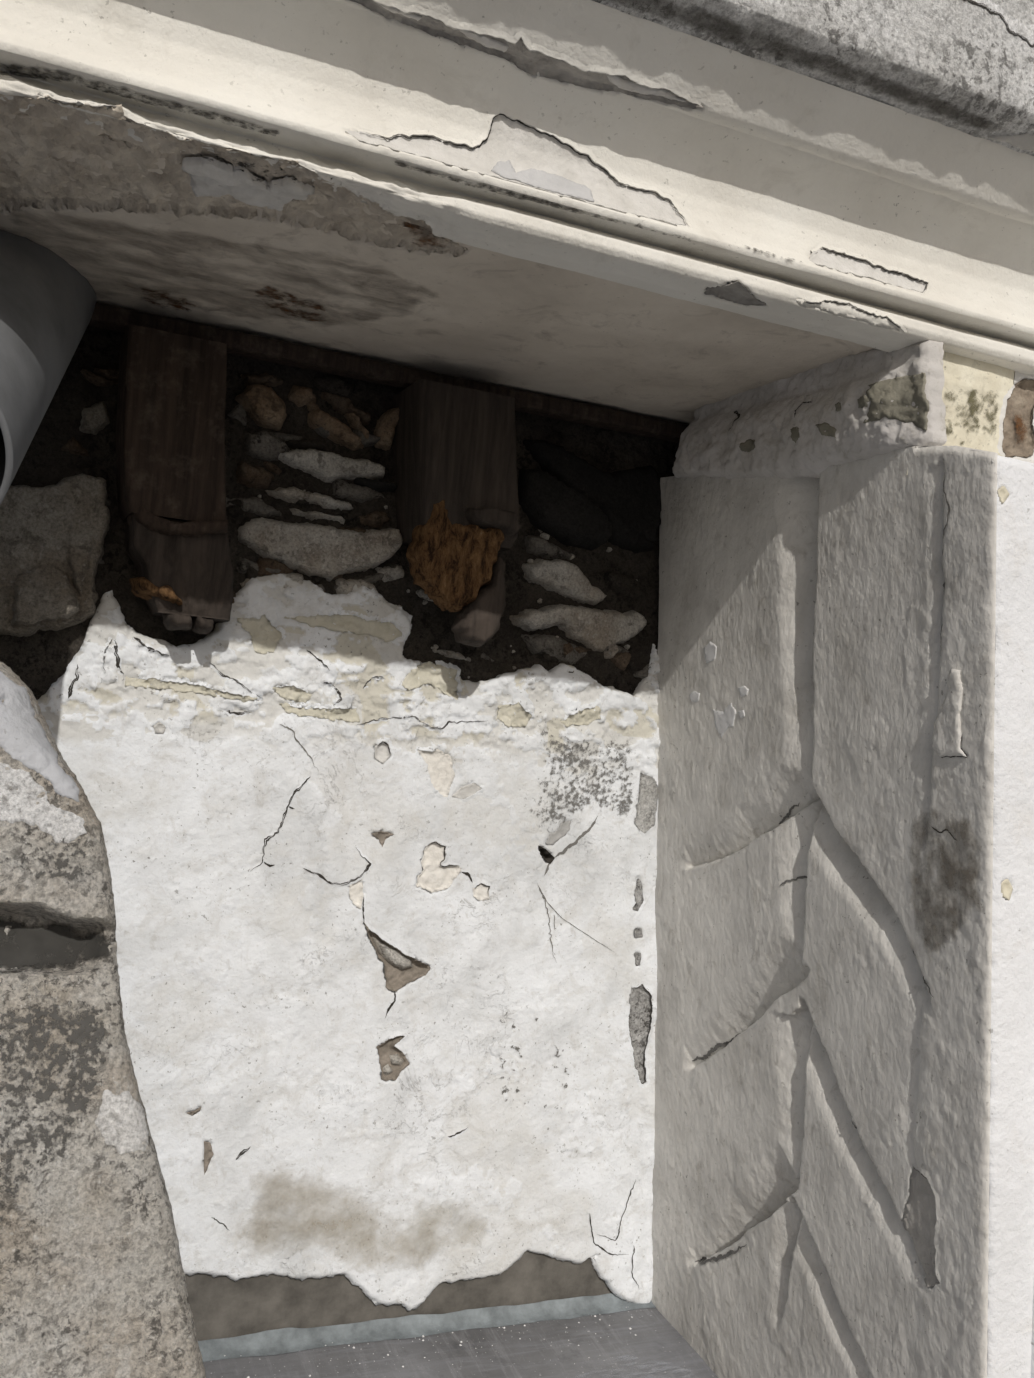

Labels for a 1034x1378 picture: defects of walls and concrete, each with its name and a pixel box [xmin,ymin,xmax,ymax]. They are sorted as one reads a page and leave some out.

peeling [350,0,704,109]
flaking render [0,91,467,257]
peeling [345,106,692,230]
peeling [809,243,932,296]
crack [68,637,171,699]
crack [308,651,489,732]
peeling [0,671,87,843]
crack [208,663,373,924]
crack [539,816,612,963]
flaking render [364,920,431,1018]
flaking render [377,1031,410,1081]
peeling [625,982,656,1088]